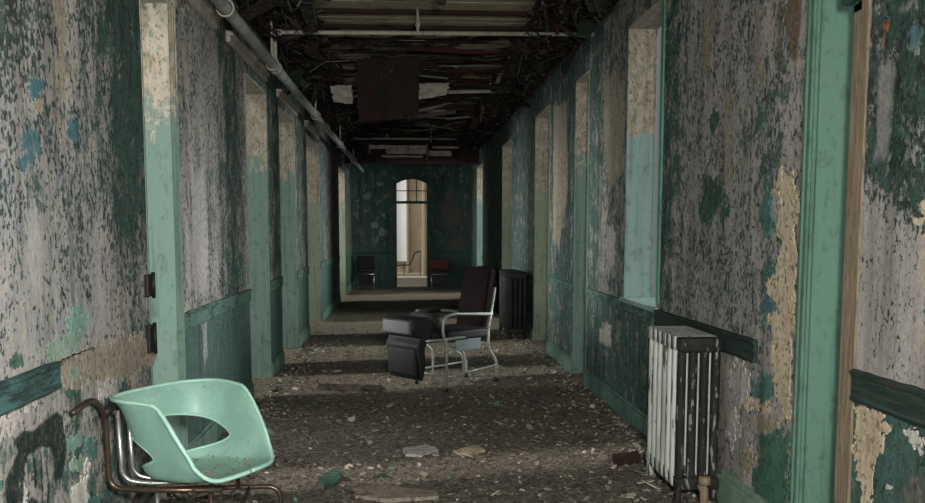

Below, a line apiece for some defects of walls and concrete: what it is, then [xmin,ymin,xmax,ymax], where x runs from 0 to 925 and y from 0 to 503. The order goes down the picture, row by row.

flaking render [370,145,459,158]
spalling [553,100,568,250]
peeling [698,173,731,228]
spalling [912,199,925,226]
peeling [9,351,24,370]
spalling [46,299,157,404]
spalling [725,165,801,503]
spalling [0,400,38,443]
water stain [5,413,66,503]
peeling [63,430,101,503]
spalling [851,404,892,503]
peeling [903,427,925,456]